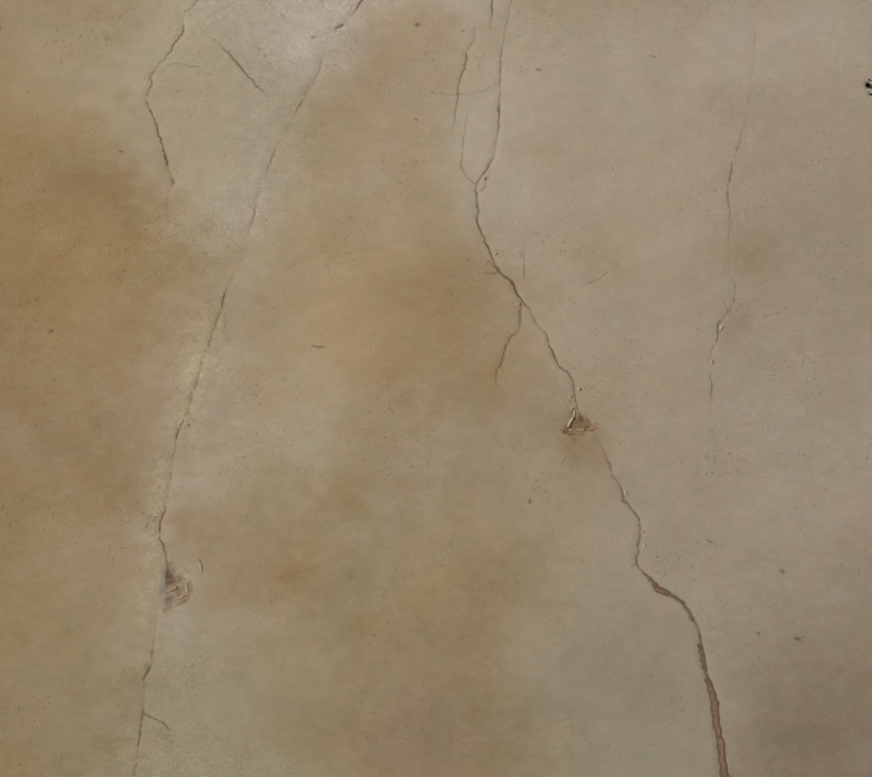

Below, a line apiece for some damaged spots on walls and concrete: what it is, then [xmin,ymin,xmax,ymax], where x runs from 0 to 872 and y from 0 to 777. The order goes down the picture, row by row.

crack [476,207,525,305]
crack [644,573,729,777]